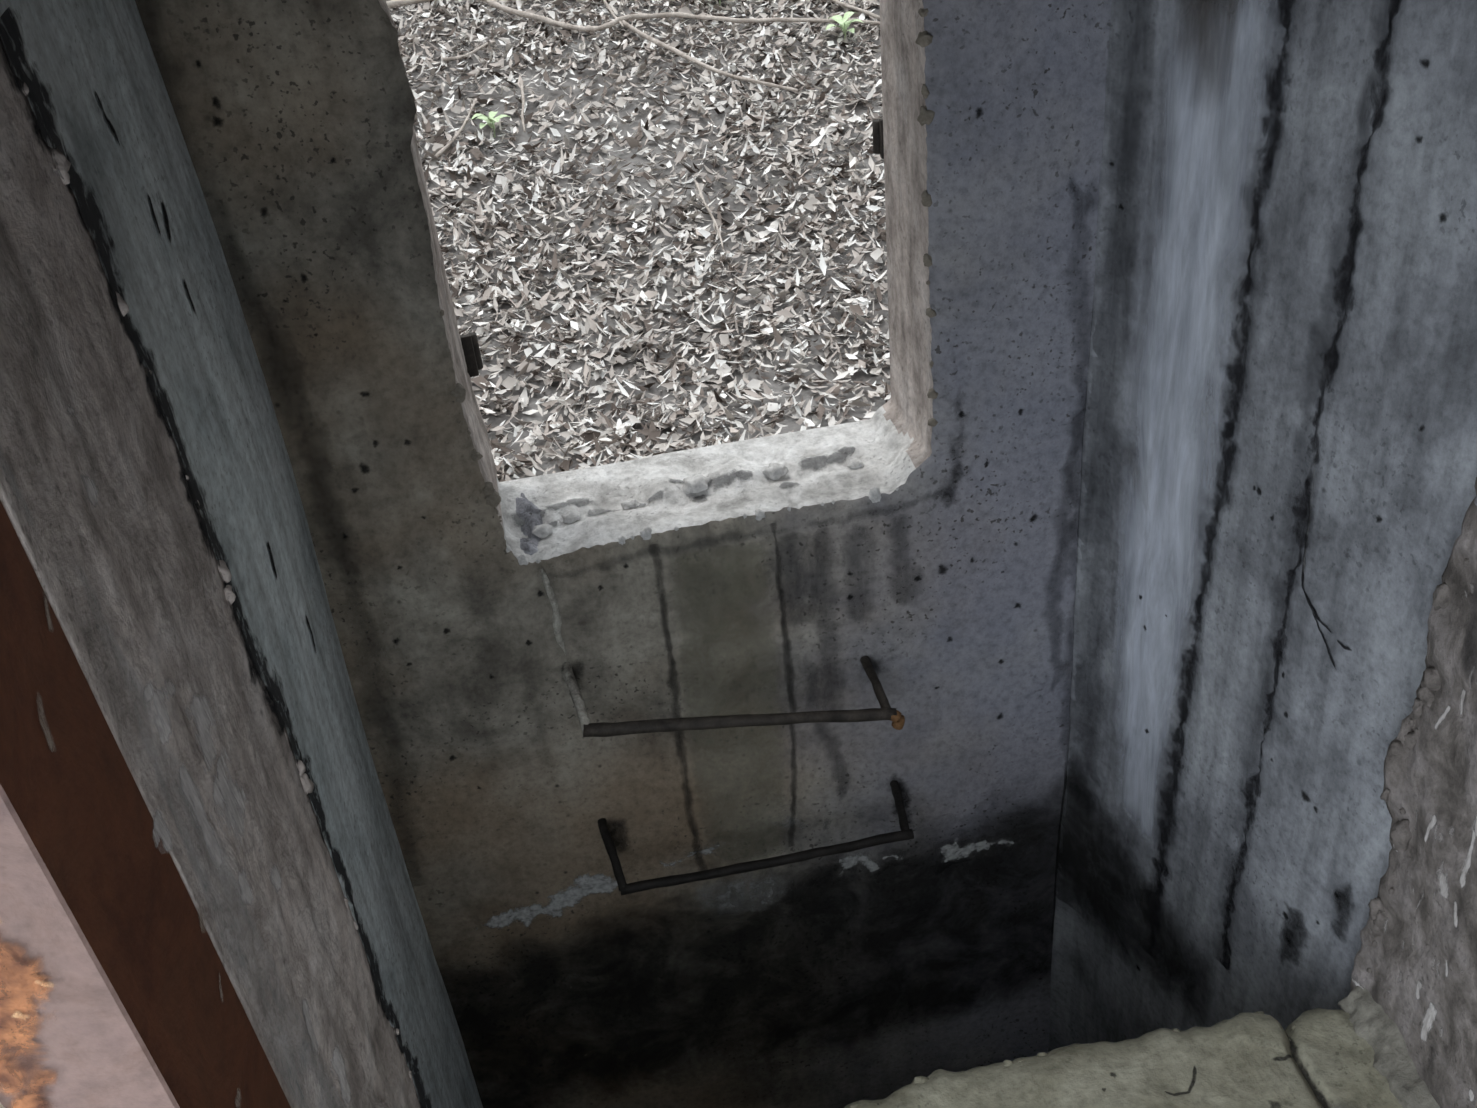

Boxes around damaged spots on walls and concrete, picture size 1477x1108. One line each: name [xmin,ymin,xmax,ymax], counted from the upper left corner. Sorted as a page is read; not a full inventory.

crack [1147,0,1293,956]
crack [1222,0,1400,970]
corrosion [0,945,55,1108]
leakage [441,774,1196,1108]
spalling [1380,788,1412,852]
spalling [1390,667,1441,755]